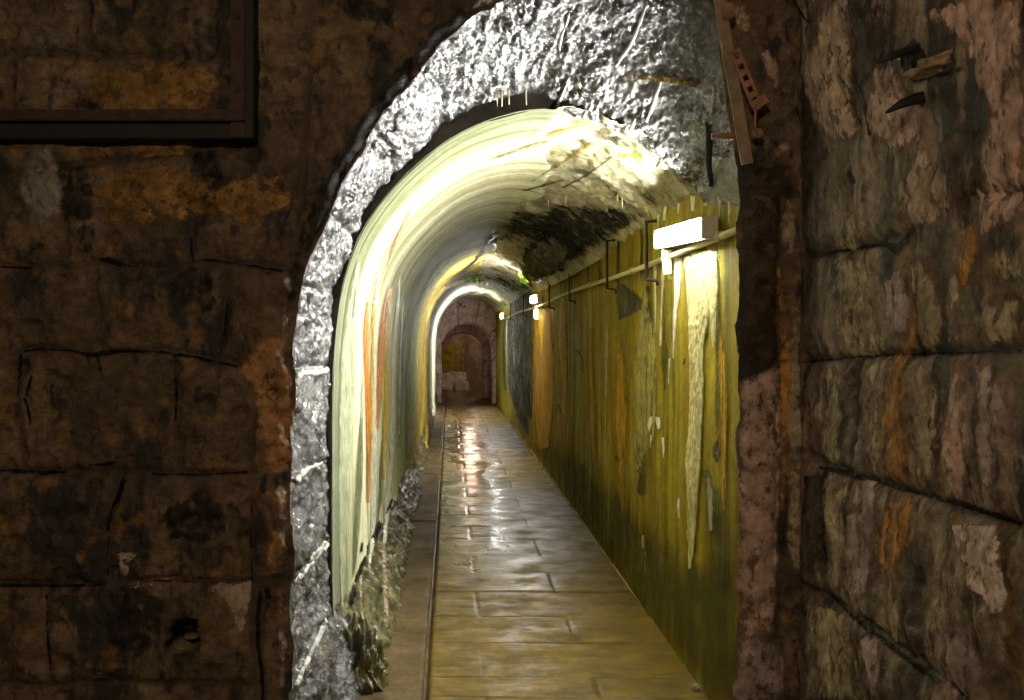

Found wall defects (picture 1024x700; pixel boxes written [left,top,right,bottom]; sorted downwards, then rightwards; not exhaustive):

rust [958,225,976,285]
leakage [503,206,727,569]
rust [881,302,918,482]
spalling [712,441,721,462]
rust [875,497,913,574]